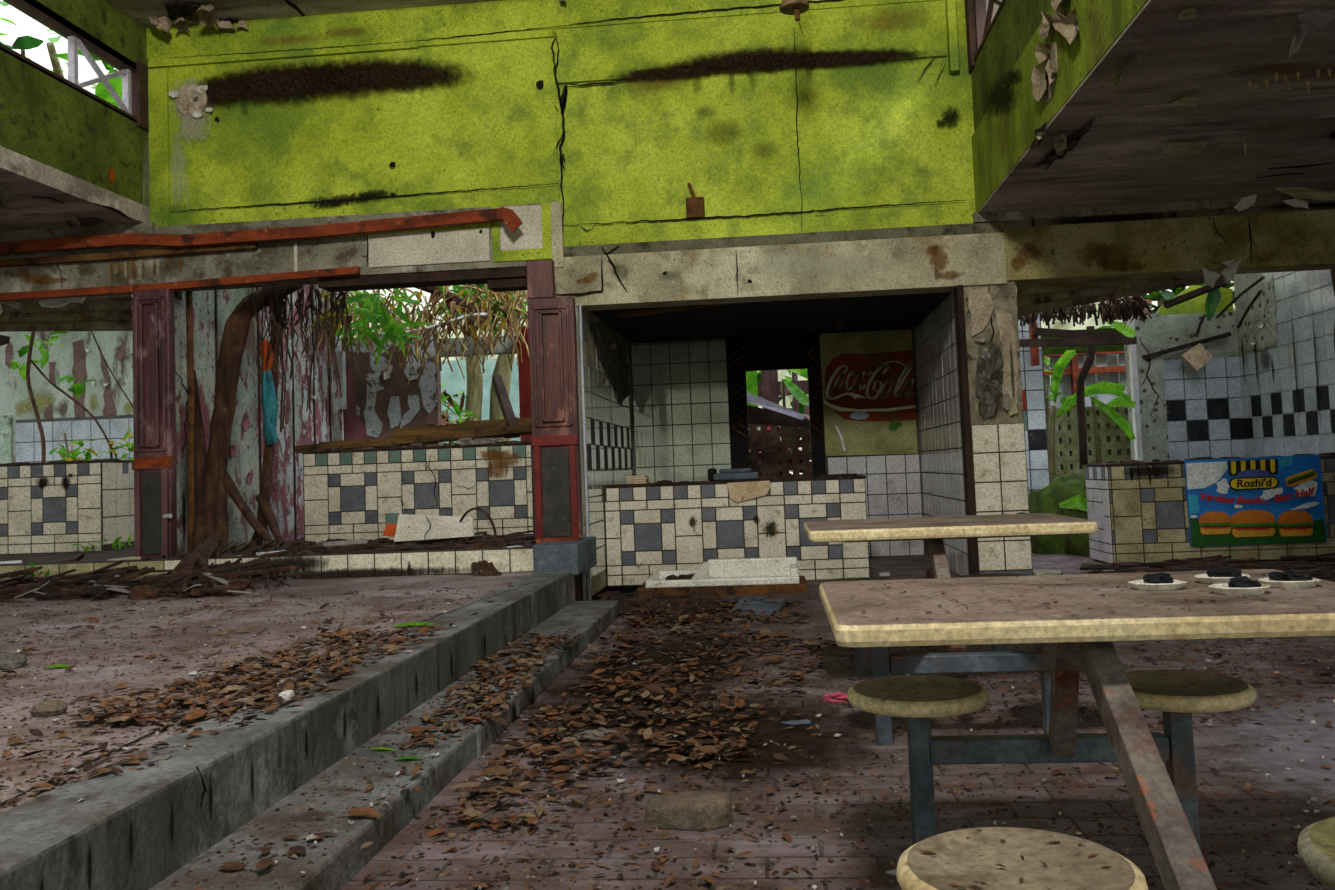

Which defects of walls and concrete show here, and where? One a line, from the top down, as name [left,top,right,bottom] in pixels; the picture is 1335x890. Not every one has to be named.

damp [195,62,462,107]
damp [622,47,918,81]
crack [171,0,965,296]
peeling [1234,194,1257,211]
peeling [1275,187,1335,209]
peeling [227,341,258,508]